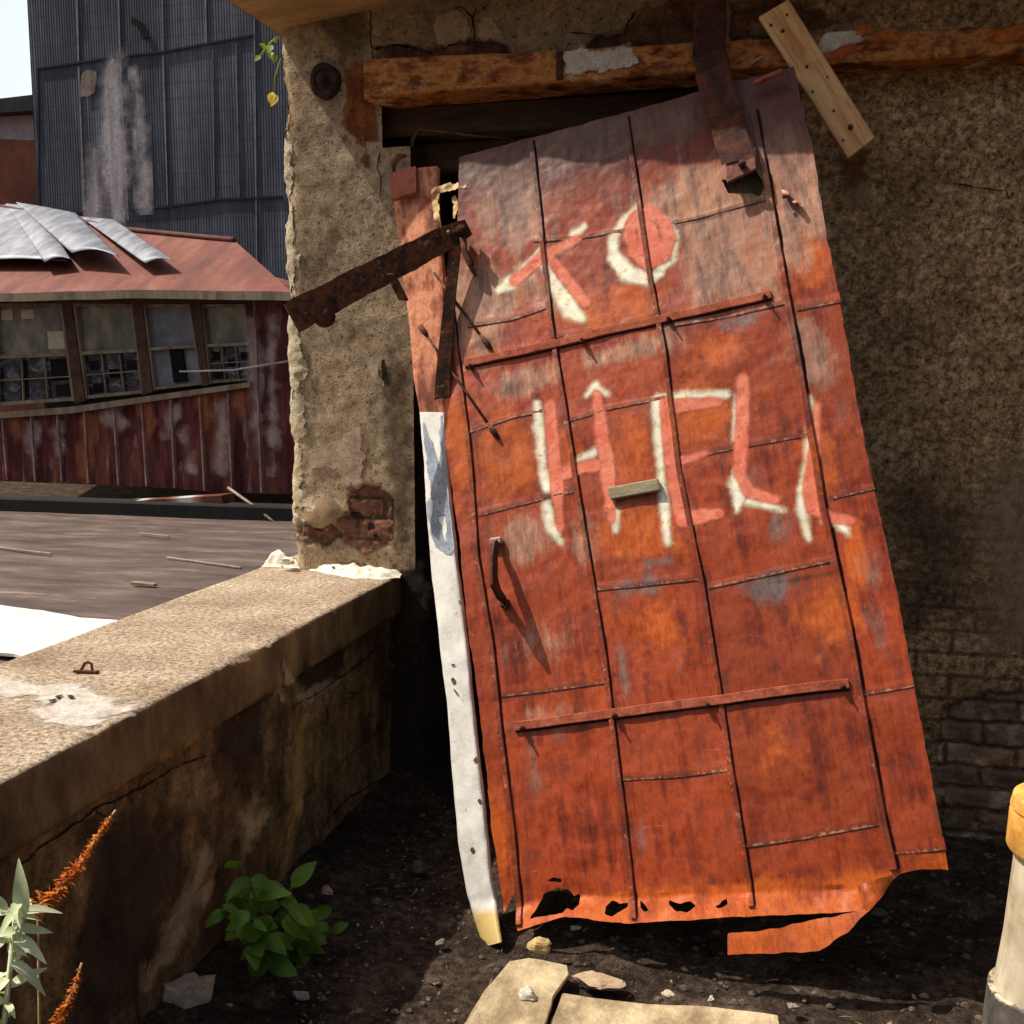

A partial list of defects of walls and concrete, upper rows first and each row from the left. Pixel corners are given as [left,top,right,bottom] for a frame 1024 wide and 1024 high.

crack [369,1,489,59]
spalling [563,0,694,74]
water stain [86,59,153,223]
peeling [284,89,301,298]
corrosion [841,150,866,188]
spalling [287,316,393,554]
crack [15,754,213,868]
water stain [221,695,272,758]
water stain [287,712,320,841]
spalling [934,690,1024,841]